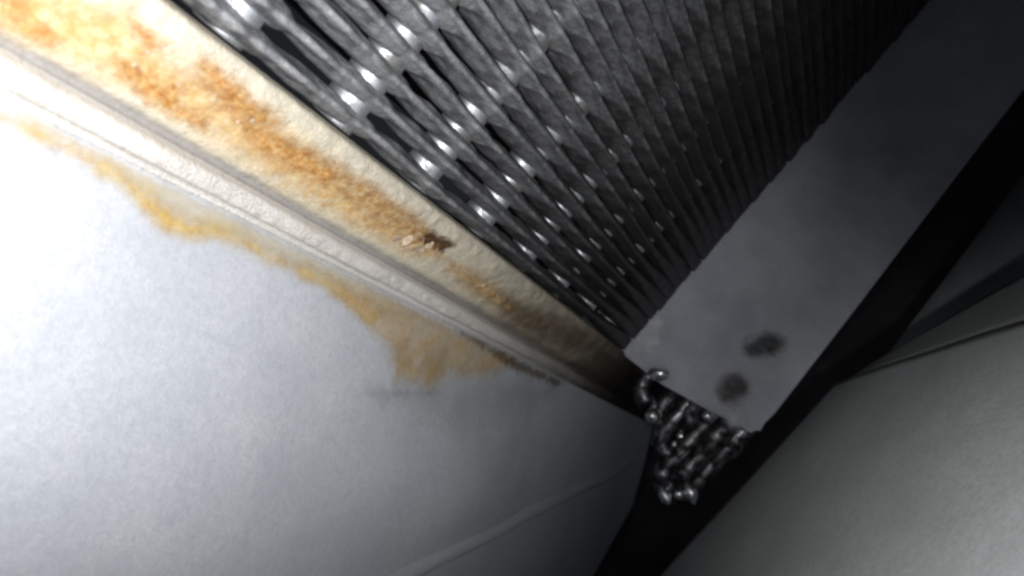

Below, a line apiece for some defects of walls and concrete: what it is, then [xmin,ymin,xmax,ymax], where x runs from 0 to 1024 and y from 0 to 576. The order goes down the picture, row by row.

corrosion [0,0,595,347]
leakage [97,156,505,382]
corrosion [463,333,559,387]